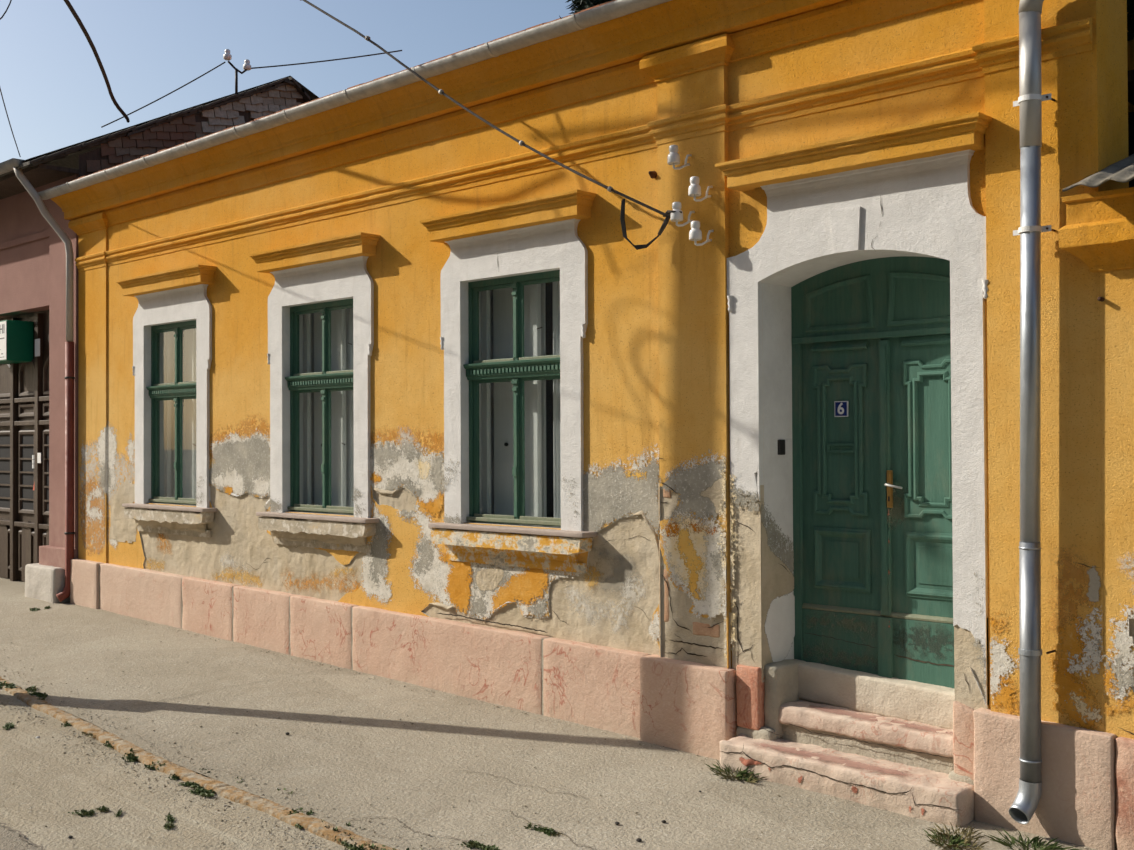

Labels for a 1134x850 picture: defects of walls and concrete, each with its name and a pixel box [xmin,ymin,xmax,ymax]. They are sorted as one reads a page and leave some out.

flaking render [110,428,795,682]
flaking render [1086,566,1101,603]
crack [721,723,957,810]